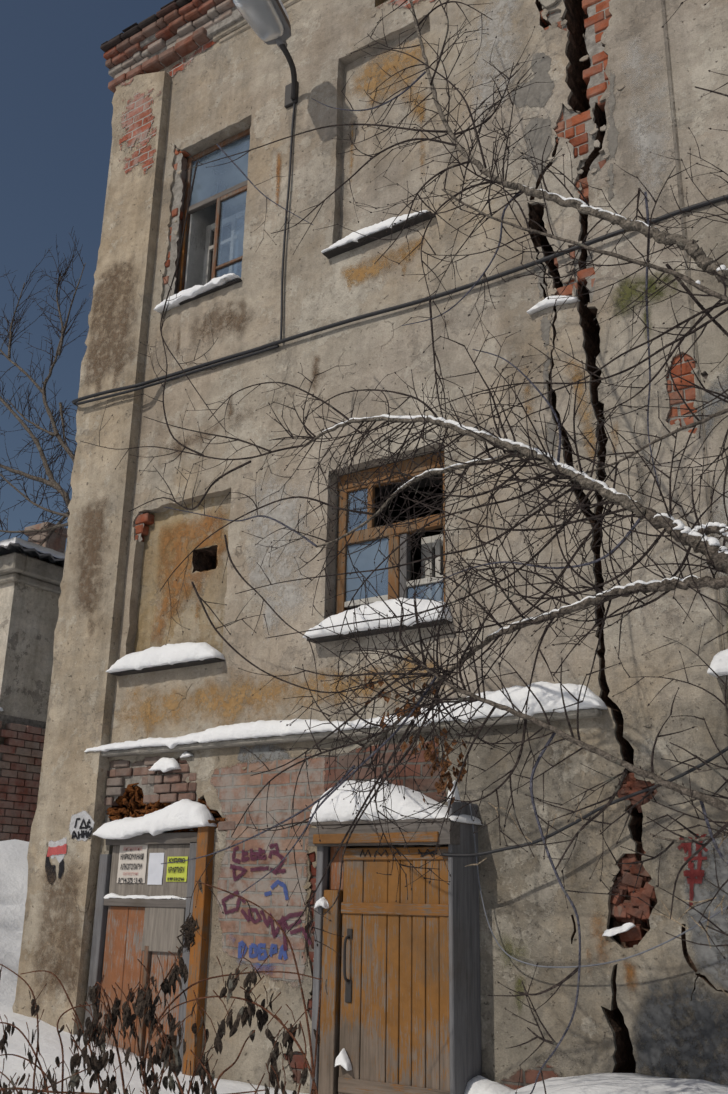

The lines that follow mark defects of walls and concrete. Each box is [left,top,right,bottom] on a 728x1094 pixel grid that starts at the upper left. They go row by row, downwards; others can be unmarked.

flaking render [119,77,161,174]
flaking render [163,147,191,301]
leakage [87,263,132,392]
crack [528,0,643,861]
flaking render [665,353,728,438]
flaking render [104,732,446,1018]
crack [569,915,577,944]
crack [640,918,650,932]
flaking render [681,822,728,988]
crack [603,965,636,1073]
flaking render [635,982,728,1086]